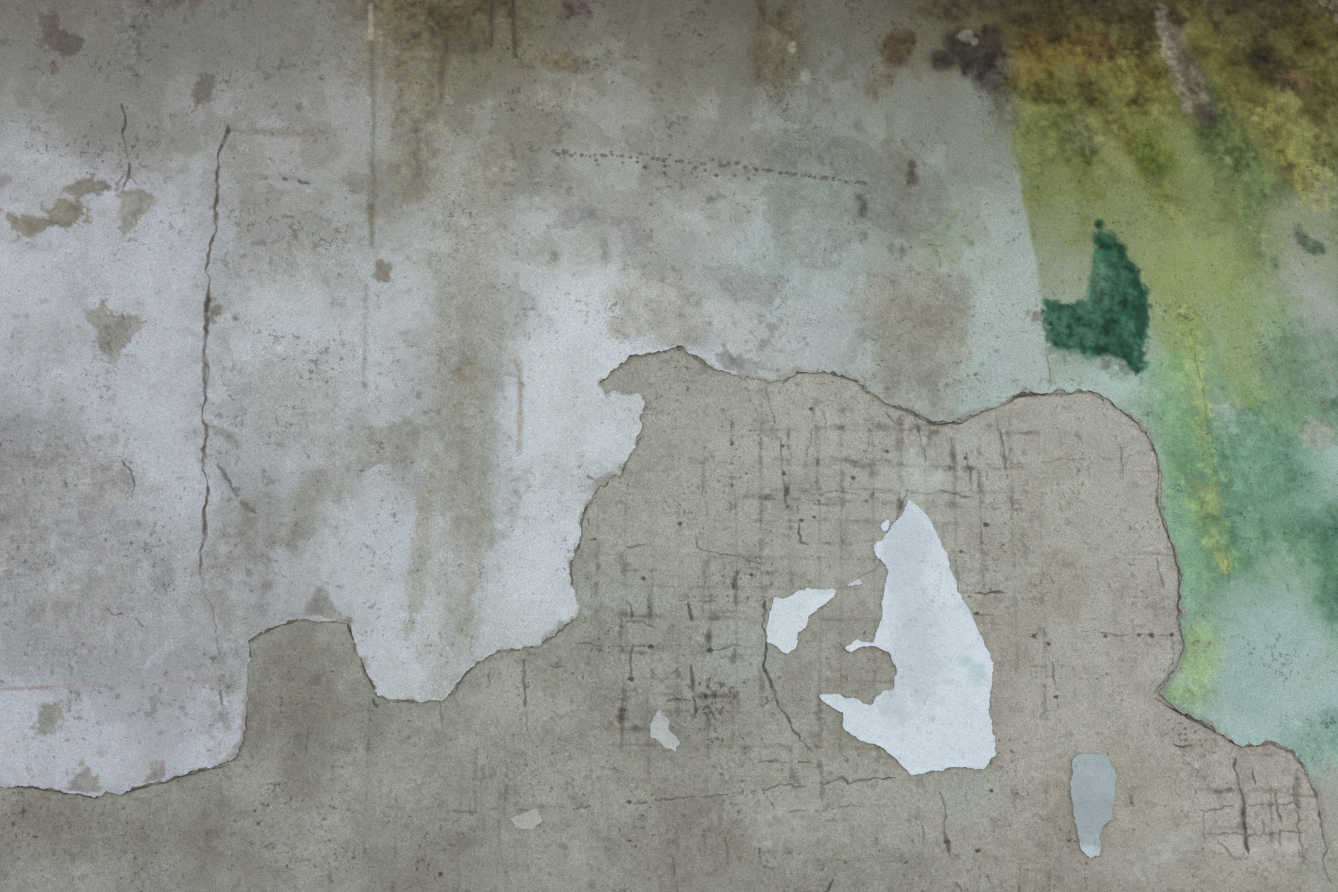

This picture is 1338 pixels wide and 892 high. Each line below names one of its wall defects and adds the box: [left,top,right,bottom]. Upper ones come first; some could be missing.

peeling [36,0,86,76]
water stain [486,0,599,78]
water stain [861,0,1338,282]
peeling [0,169,160,248]
water stain [1089,217,1138,311]
peeling [70,296,145,364]
crack [199,124,257,706]
water stain [0,0,526,794]
water stain [1037,343,1135,383]
flaking render [0,339,1338,892]
crack [1198,757,1333,884]